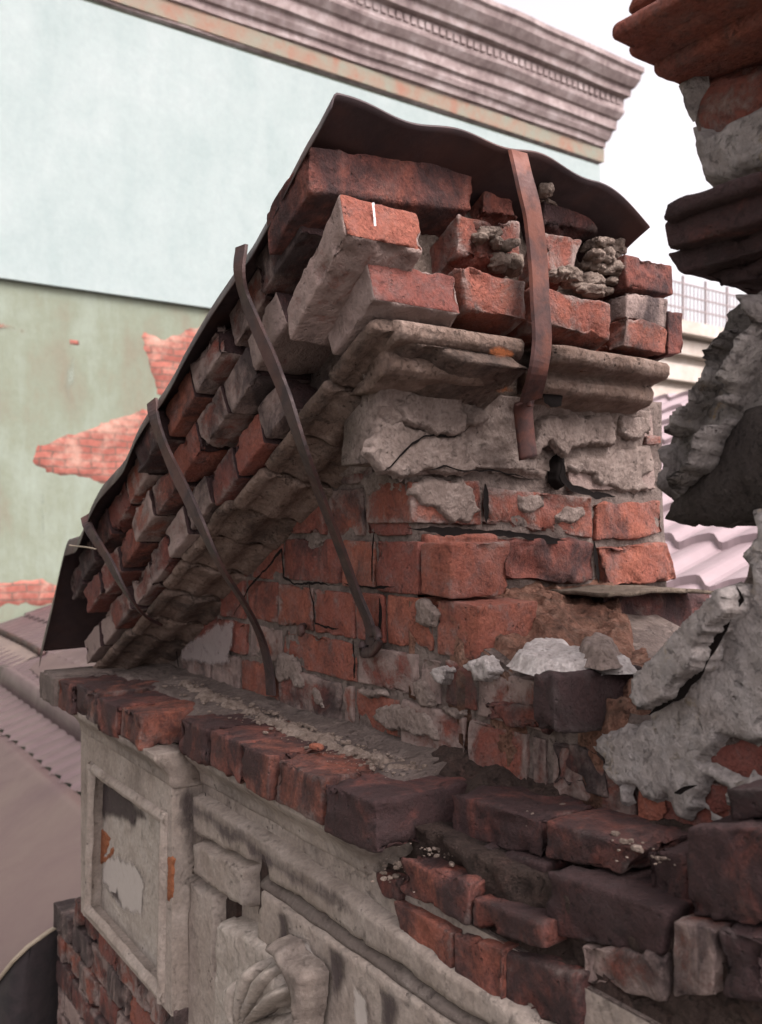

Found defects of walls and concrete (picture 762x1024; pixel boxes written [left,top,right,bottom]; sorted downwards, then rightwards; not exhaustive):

flaking render [679,76,762,187]
crack [387,426,470,469]
crack [408,465,566,544]
peeling [517,494,544,513]
spalling [547,455,566,490]
crack [592,540,600,583]
crack [234,532,395,678]
crack [649,586,744,715]
spalling [358,509,762,1024]
peeling [100,829,144,915]
spalling [167,856,176,902]